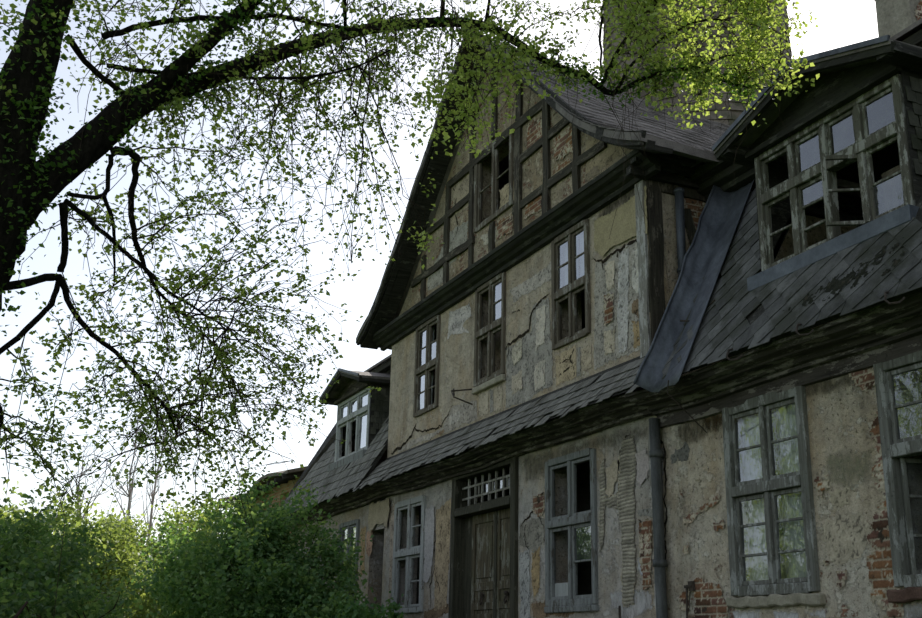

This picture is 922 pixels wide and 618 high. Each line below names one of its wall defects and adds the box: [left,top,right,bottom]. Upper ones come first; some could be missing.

crack [593,239,637,269]
peeling [398,241,640,453]
crack [505,293,550,356]
crack [391,406,452,455]
flaking render [635,450,649,488]
flaking render [866,411,904,618]
flaking render [519,493,581,618]
flaking render [638,508,653,590]
flaking render [679,575,728,618]